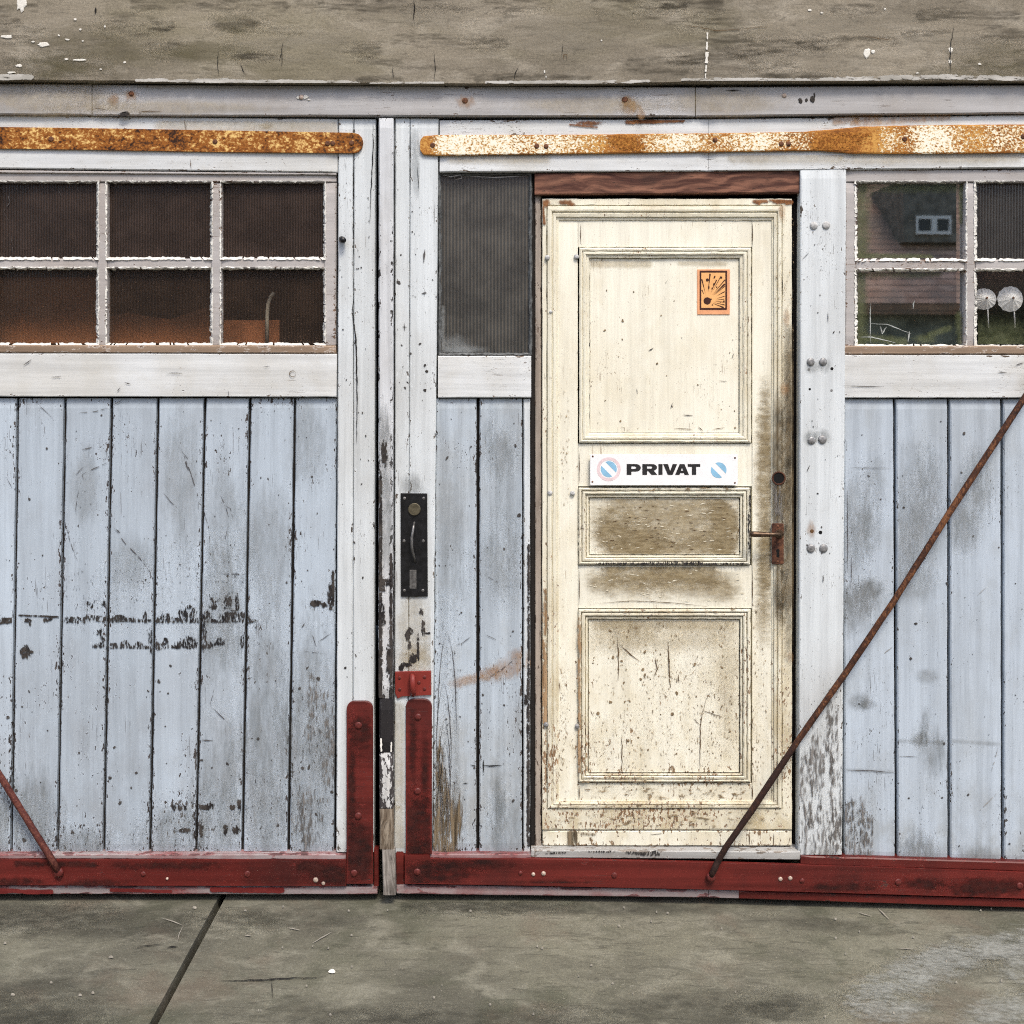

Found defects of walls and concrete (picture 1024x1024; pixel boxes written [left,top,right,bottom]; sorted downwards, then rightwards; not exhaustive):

peeling [0,64,34,80]
rust [608,135,646,152]
rust [810,132,872,150]
damp [757,334,794,621]
damp [598,499,739,554]
peeling [0,544,274,653]
peeling [20,644,33,659]
peeling [360,439,475,852]
peeling [545,600,745,854]